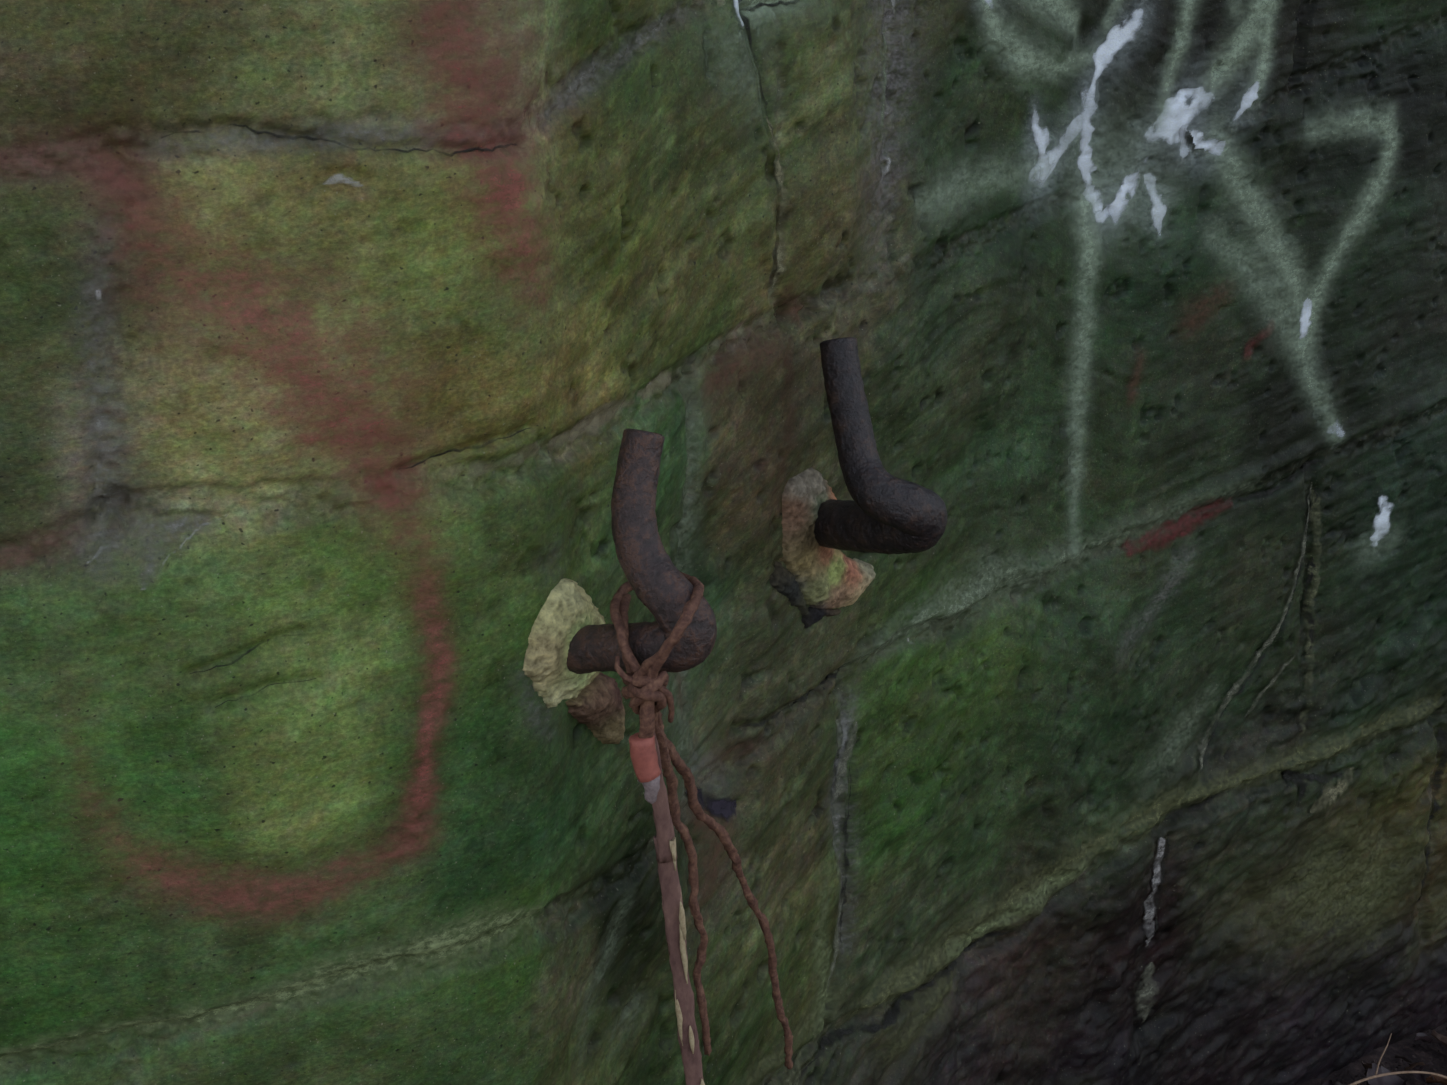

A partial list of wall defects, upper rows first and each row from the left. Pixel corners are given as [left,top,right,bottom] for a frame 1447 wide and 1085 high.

crack [738,1,796,193]
crack [772,237,786,288]